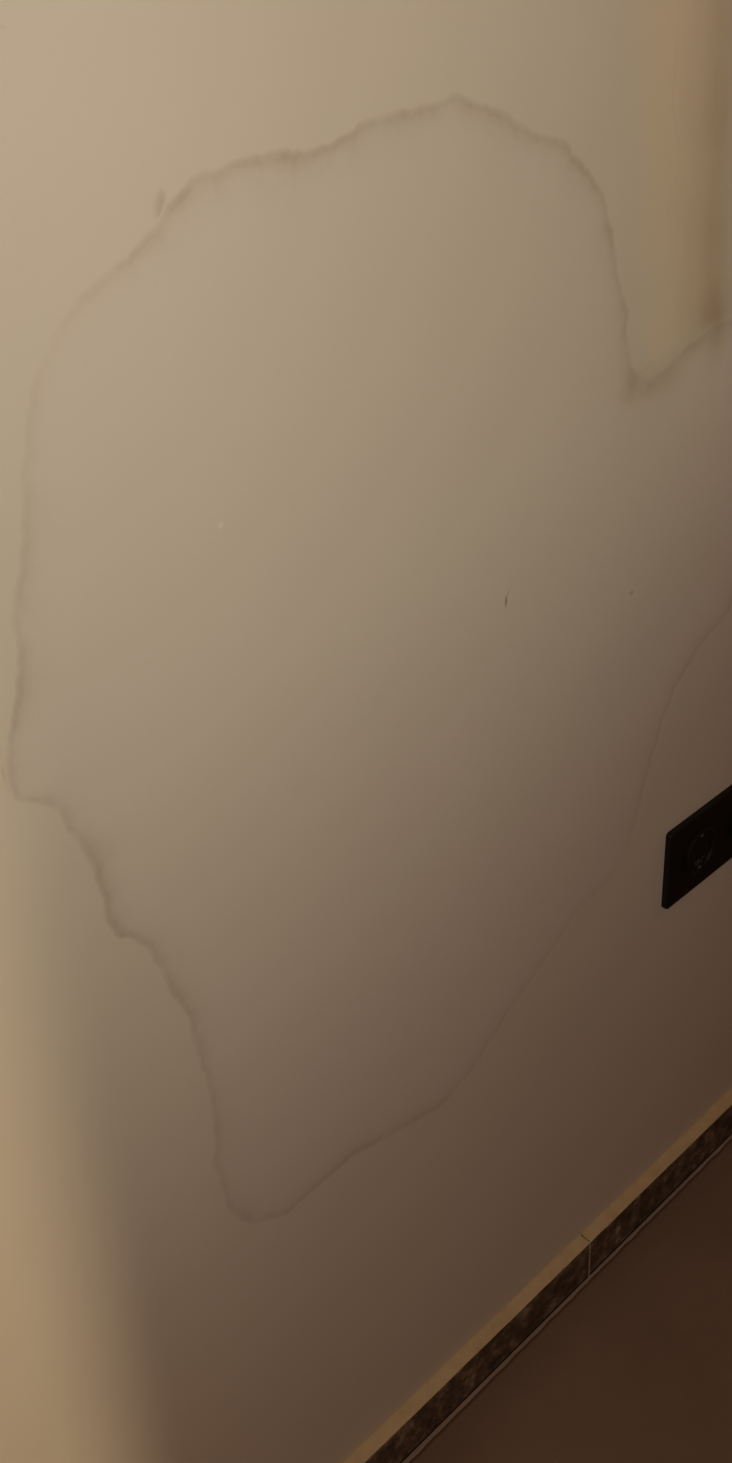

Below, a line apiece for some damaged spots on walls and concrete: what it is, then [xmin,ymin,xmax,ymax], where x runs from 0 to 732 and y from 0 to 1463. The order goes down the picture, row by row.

leakage [0,79,732,1234]
leakage [621,0,732,361]